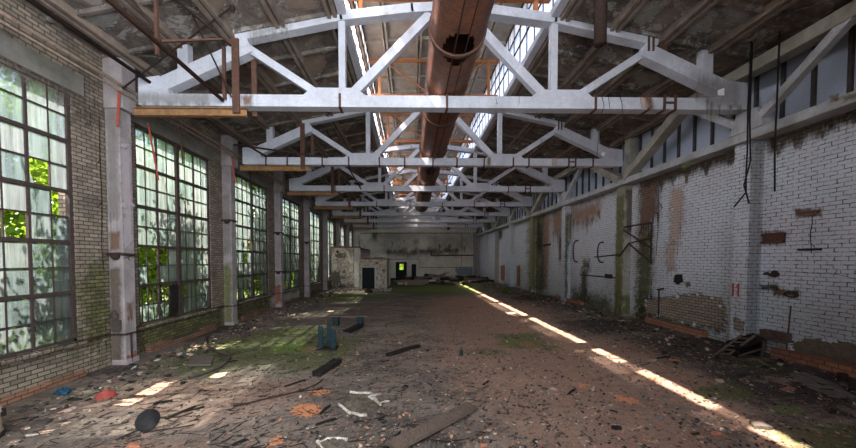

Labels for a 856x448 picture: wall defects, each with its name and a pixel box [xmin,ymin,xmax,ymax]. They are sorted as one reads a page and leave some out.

water stain [768,109,856,155]
rust [638,179,660,243]
peeling [643,274,745,333]
flaking render [788,338,856,365]